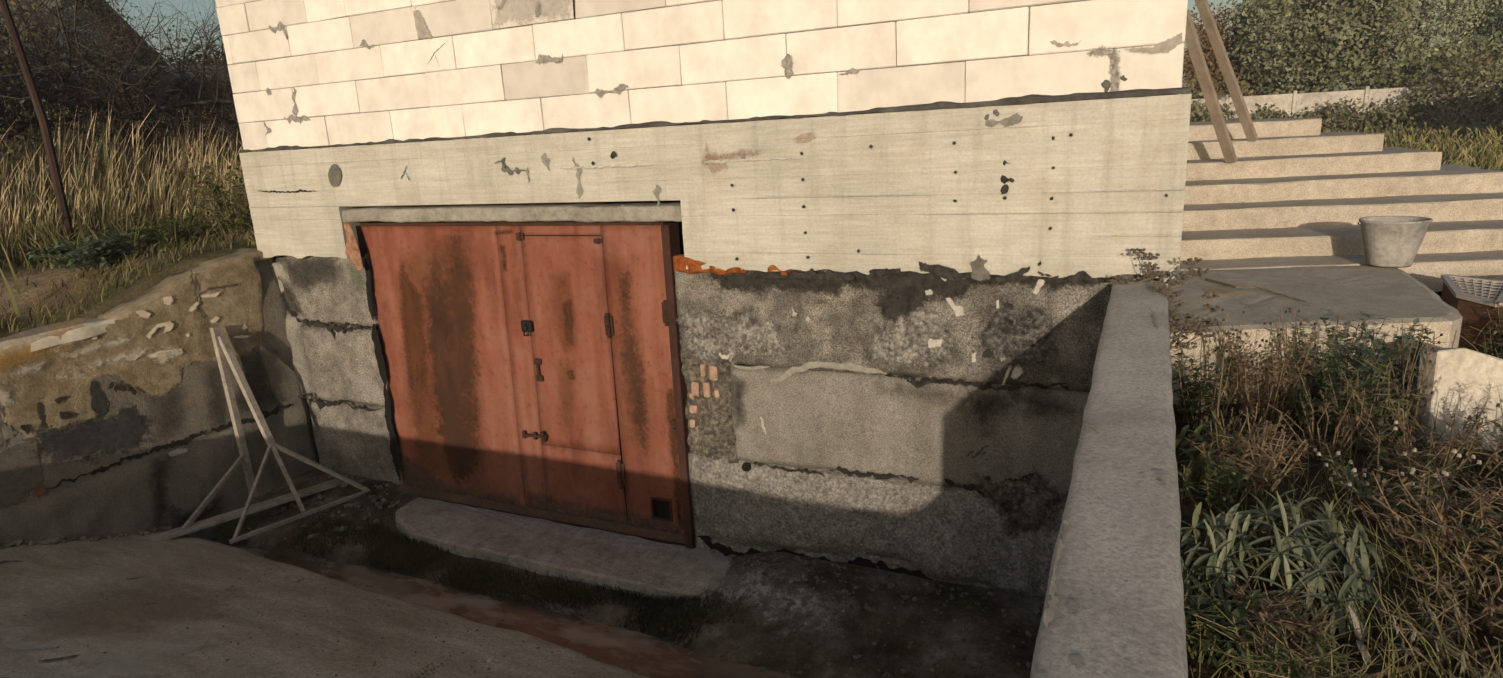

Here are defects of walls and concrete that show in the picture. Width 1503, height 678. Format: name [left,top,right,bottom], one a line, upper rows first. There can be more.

peeling [0,256,264,440]
crack [46,258,401,490]
rust [400,269,431,464]
rust [558,282,573,344]
rust [619,277,645,444]
spalling [763,268,901,281]
spalling [864,255,1101,386]
spalling [168,448,188,457]
rust [667,389,682,526]